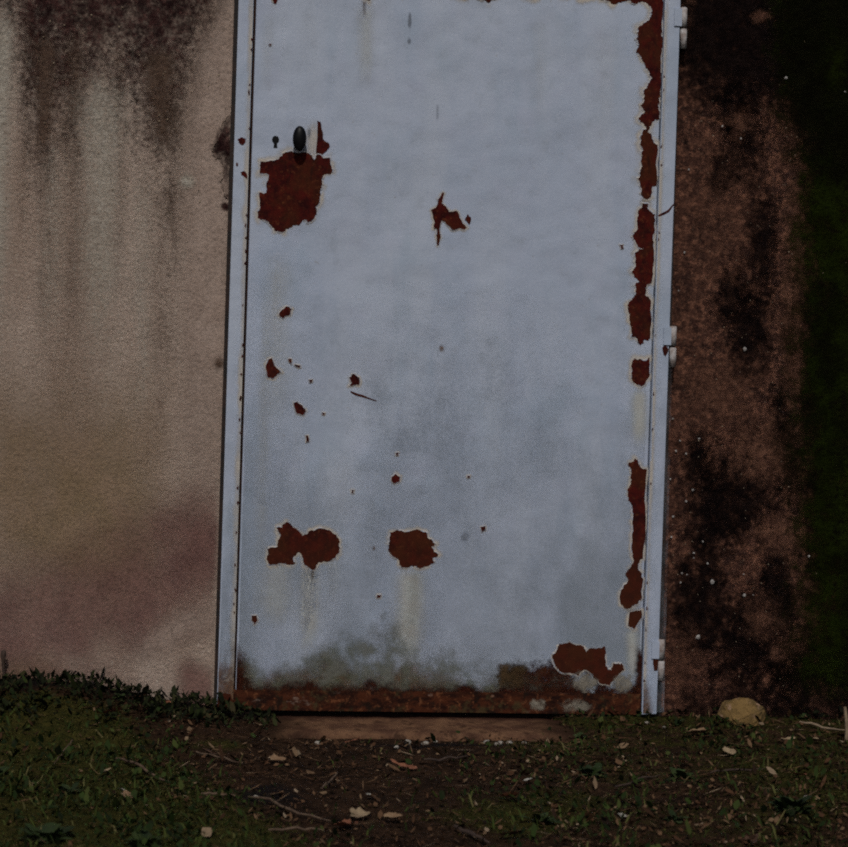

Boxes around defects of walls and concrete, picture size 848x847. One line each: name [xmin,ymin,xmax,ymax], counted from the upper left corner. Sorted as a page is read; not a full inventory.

damp [785,0,848,180]
damp [0,0,234,436]
rust [245,121,335,239]
rust [430,192,471,247]
rust [577,0,665,345]
rust [264,356,284,380]
rust [278,305,293,319]
rust [292,400,307,416]
rust [629,355,654,435]
rust [265,520,342,631]
rust [387,528,441,646]
rust [494,455,658,713]